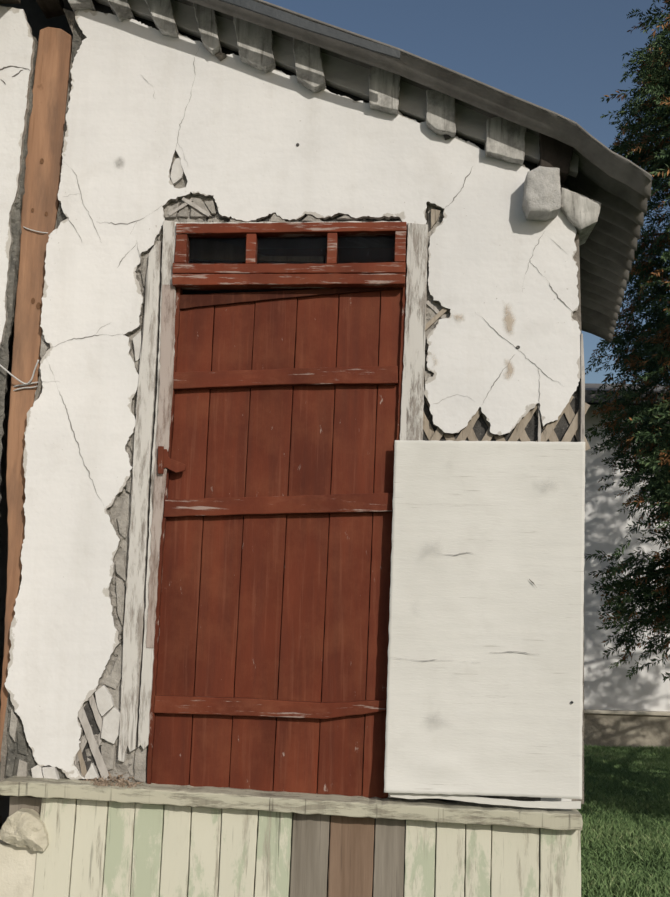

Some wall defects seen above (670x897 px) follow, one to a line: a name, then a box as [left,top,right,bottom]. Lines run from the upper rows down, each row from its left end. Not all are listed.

crack [0,45,35,461]
crack [68,171,161,265]
flaking render [257,214,400,222]
crack [522,237,573,312]
flaking render [34,329,50,402]
crack [43,323,120,497]
crack [433,312,554,404]
flaking render [423,204,591,451]
flaking render [75,434,139,782]